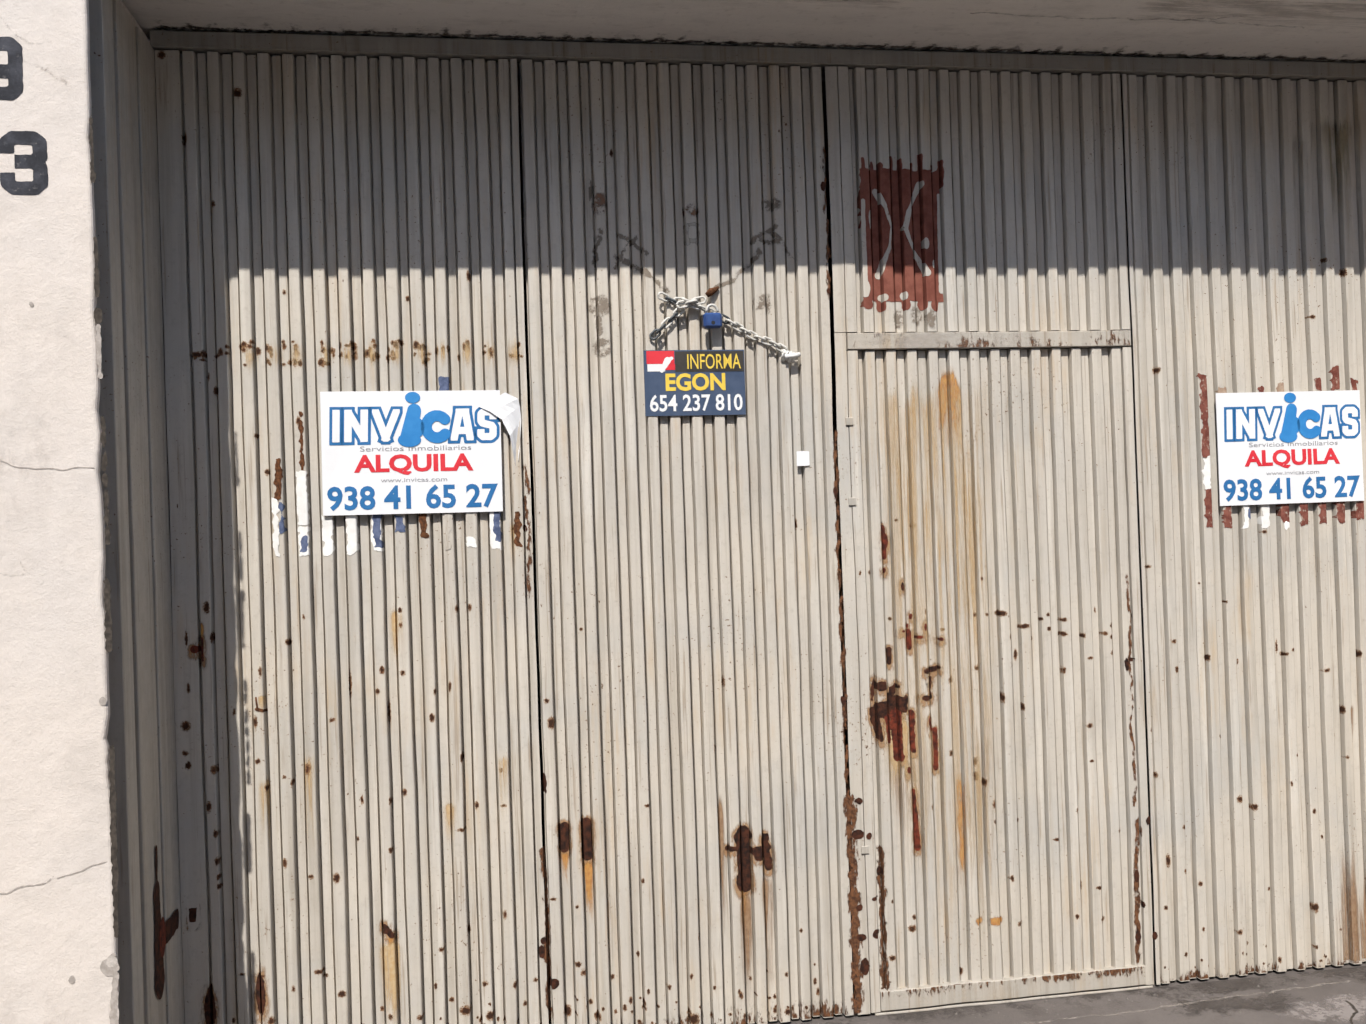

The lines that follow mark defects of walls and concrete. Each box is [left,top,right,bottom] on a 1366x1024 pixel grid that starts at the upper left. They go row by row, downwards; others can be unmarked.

corrosion [190,339,523,395]
crack [0,460,94,471]
corrosion [416,372,1158,1024]
crack [0,861,107,895]
corrosion [203,982,235,1024]
corrosion [240,963,276,1024]